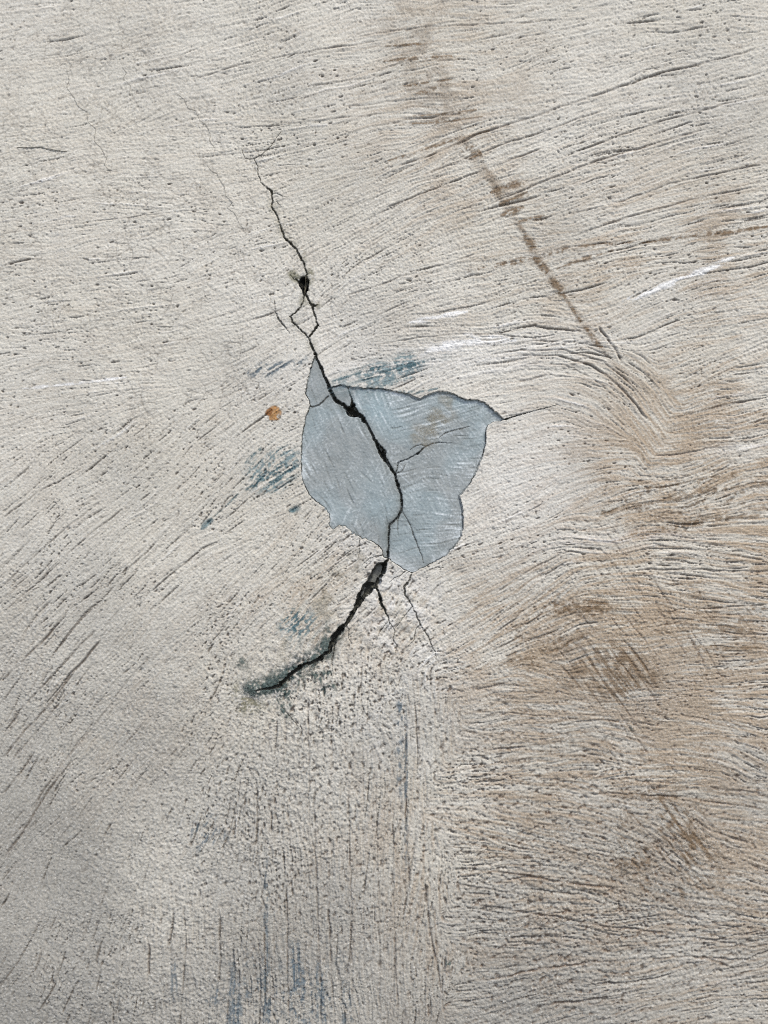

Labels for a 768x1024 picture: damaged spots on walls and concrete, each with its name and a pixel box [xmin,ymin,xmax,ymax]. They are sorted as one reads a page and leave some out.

corrosion [265,406,281,420]
crack [242,132,469,729]
peeling [300,356,506,573]